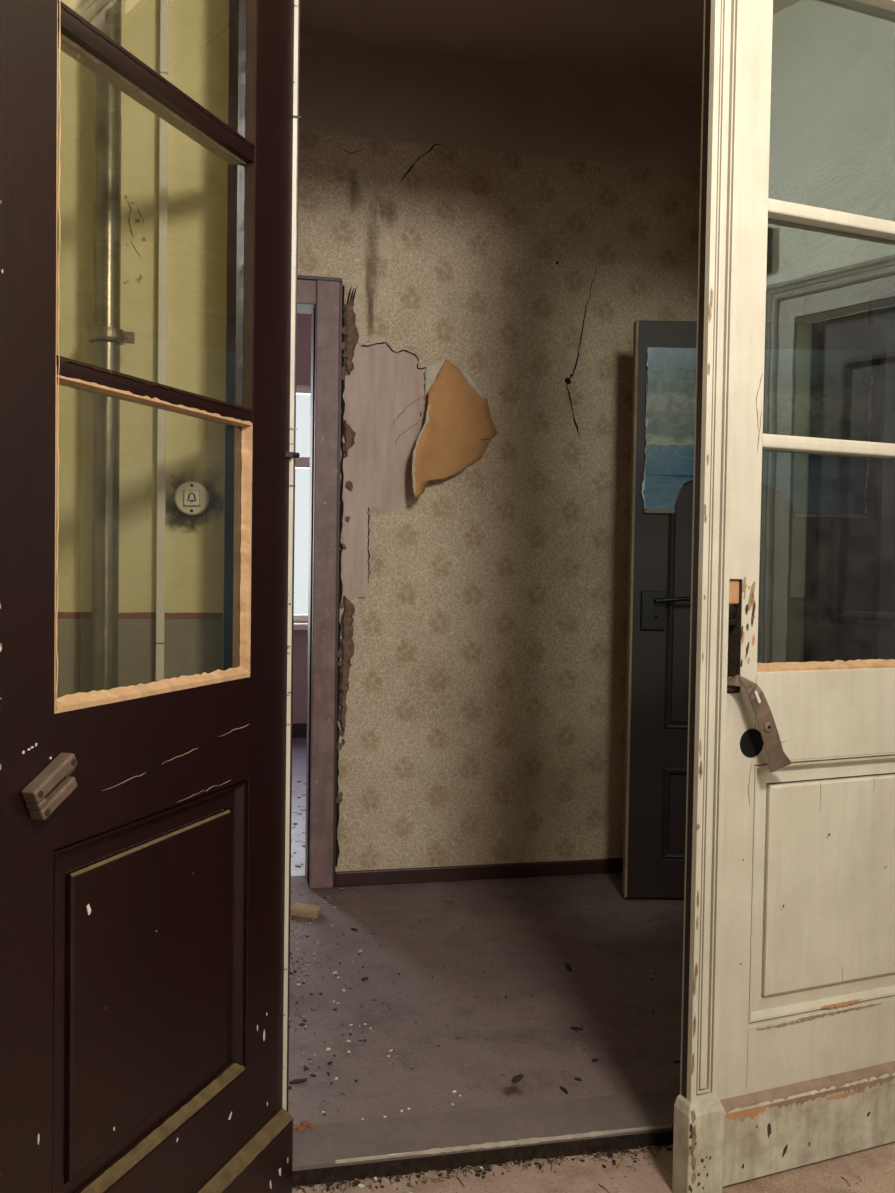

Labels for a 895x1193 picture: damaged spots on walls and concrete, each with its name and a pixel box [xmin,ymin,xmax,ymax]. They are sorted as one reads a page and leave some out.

crack [400,144,441,182]
crack [566,264,598,436]
flaking render [336,286,444,867]